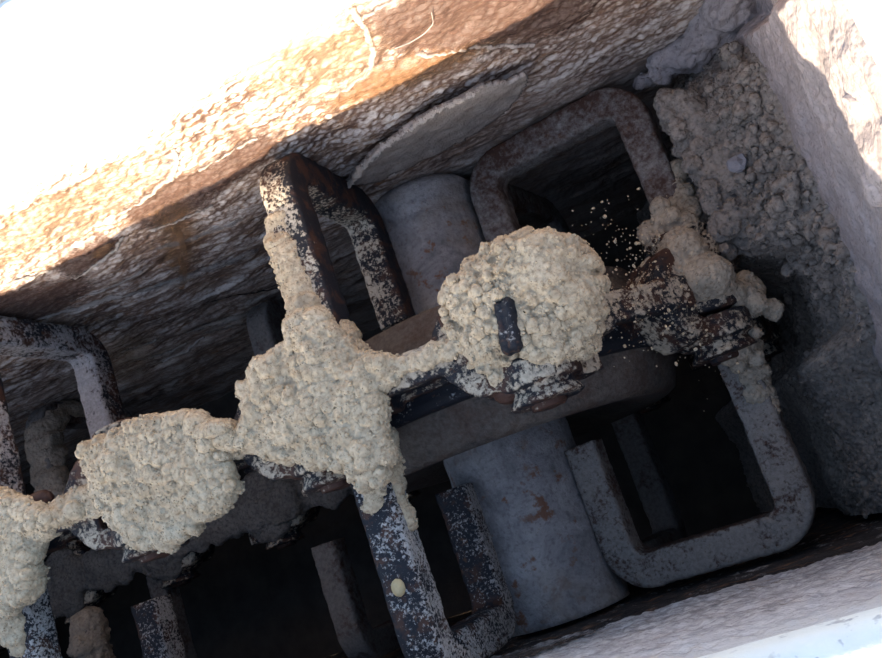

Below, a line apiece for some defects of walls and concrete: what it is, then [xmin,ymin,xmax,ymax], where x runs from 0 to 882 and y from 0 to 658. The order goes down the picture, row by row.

peeling [50,187,111,237]
spalling [120,132,286,232]
spalling [0,236,124,320]
spalling [494,296,523,356]
spalling [30,489,55,504]